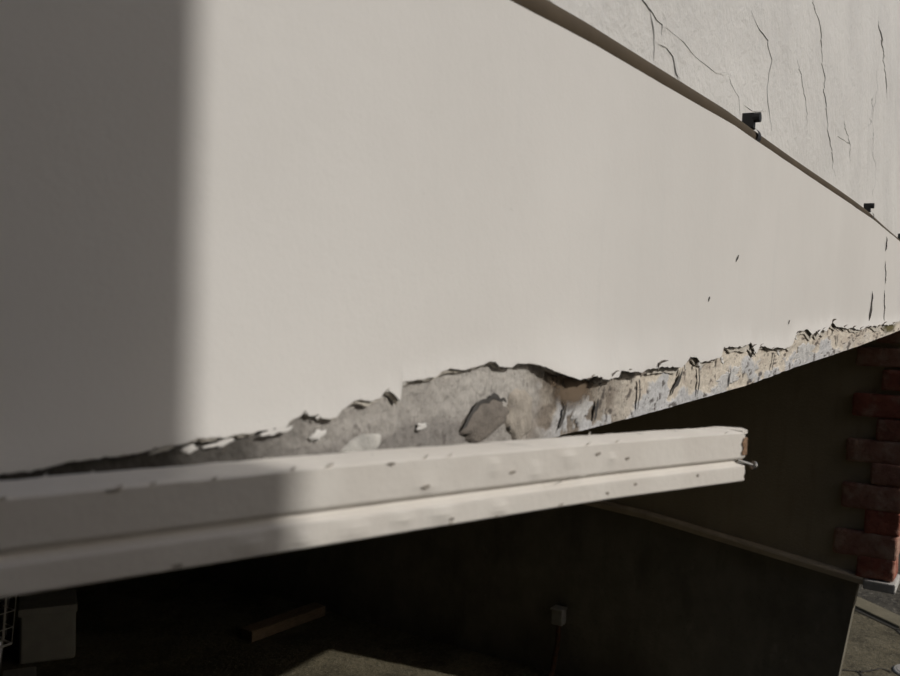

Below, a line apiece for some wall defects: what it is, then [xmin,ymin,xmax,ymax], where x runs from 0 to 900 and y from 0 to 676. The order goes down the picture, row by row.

crack [642,0,742,116]
crack [752,12,773,132]
crack [798,0,851,177]
crack [869,17,887,196]
crack [869,239,888,328]
peeling [0,319,900,481]